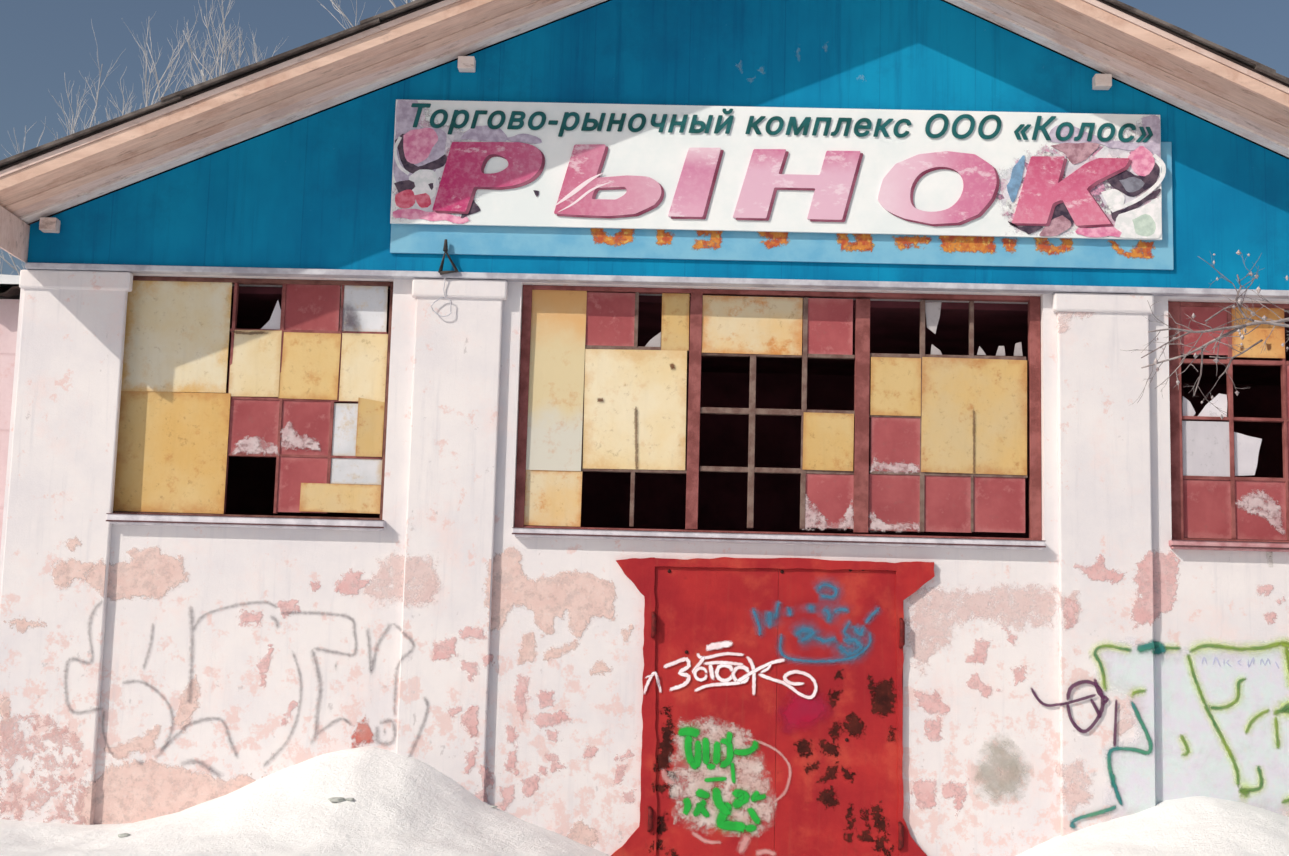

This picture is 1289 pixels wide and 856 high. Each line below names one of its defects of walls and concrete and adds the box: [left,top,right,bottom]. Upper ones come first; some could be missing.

peeling [52,536,188,601]
peeling [310,553,439,606]
peeling [1074,551,1180,627]
peeling [432,547,637,811]
peeling [966,639,1027,698]
peeling [0,674,267,825]
peeling [351,715,373,748]
corrosion [648,705,679,856]
corrosion [793,669,898,856]
peeling [914,689,950,741]
peeling [910,779,967,814]
leakage [977,744,1023,798]